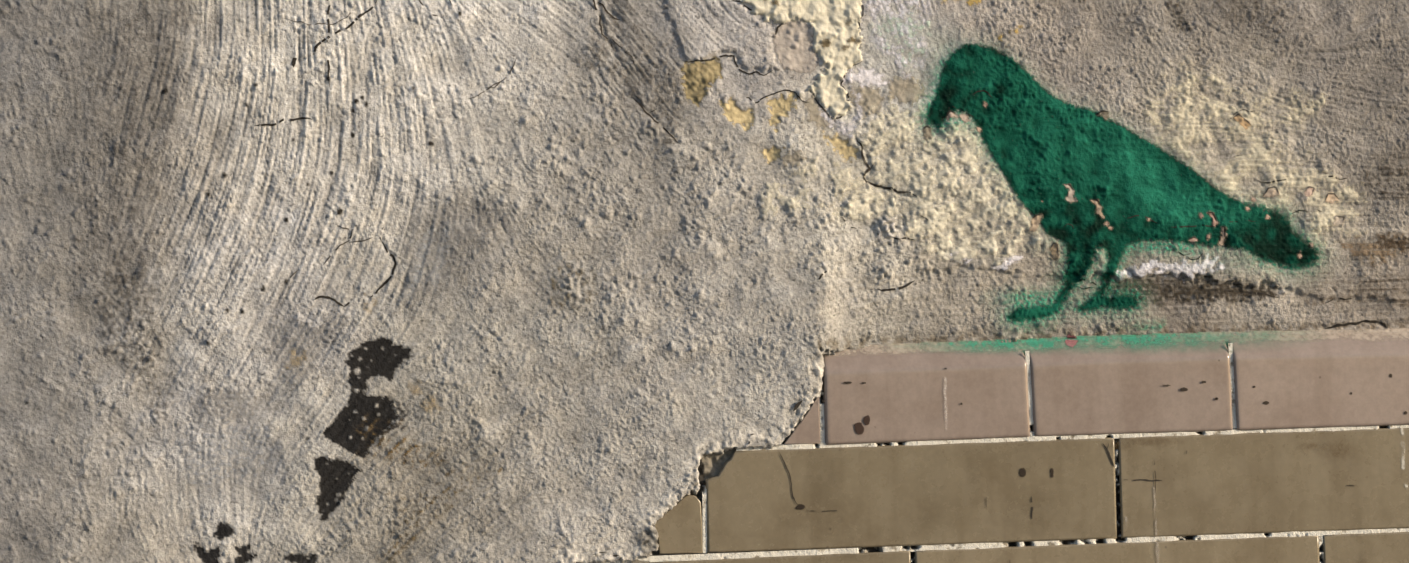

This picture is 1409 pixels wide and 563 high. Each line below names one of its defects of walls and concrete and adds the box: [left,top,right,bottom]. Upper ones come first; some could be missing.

crack [284,3,355,25]
crack [593,0,634,64]
crack [633,98,680,144]
crack [685,0,937,240]
peeling [740,0,1059,265]
crack [285,226,397,307]
crack [879,275,939,292]
spalling [698,447,736,491]